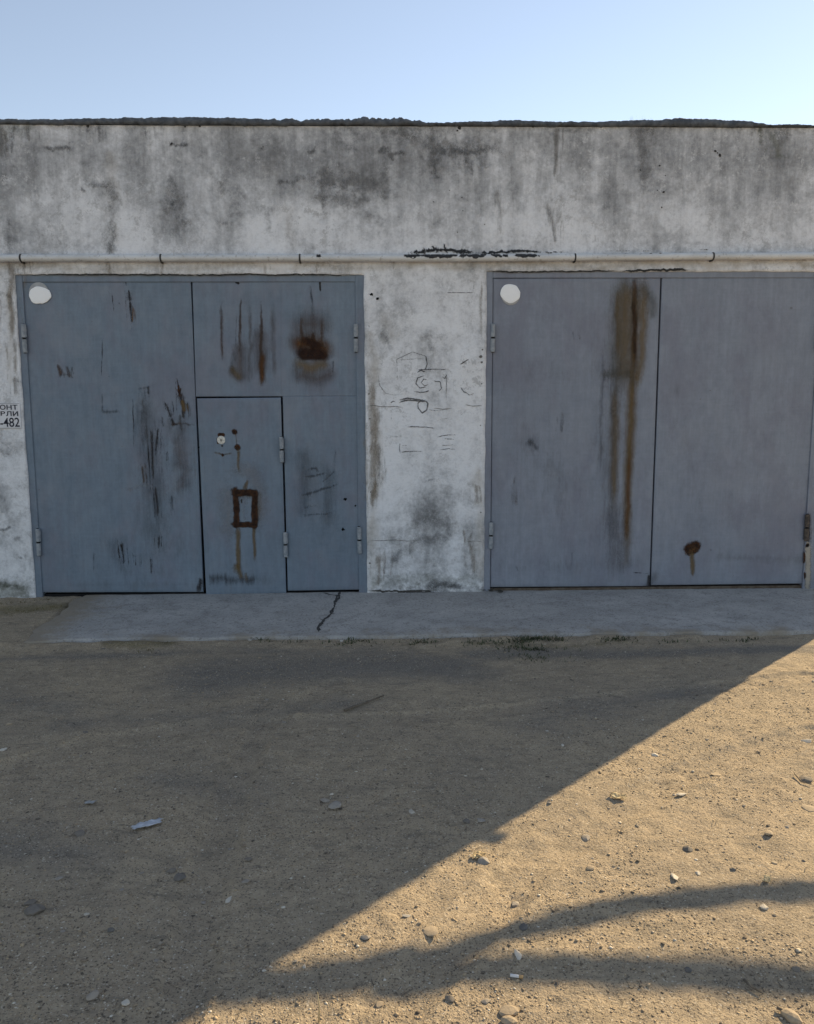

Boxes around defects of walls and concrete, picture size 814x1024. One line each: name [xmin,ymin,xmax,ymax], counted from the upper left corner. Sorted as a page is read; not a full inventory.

rust [293,319,334,381]
rust [611,285,646,538]
rust [231,481,258,579]
rust [684,541,701,575]
crack [317,592,341,631]